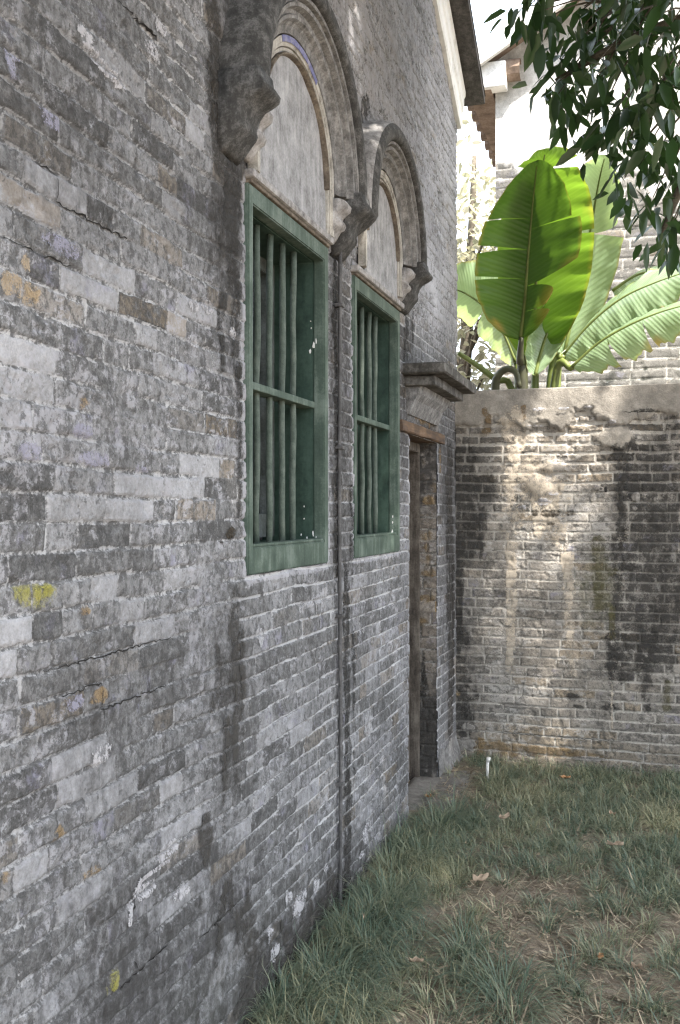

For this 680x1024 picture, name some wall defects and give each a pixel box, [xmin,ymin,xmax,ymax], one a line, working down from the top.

crack [119,1,157,41]
crack [35,161,127,240]
leakage [206,0,448,1024]
leakage [420,404,577,777]
leakage [599,408,680,729]
crack [43,634,171,715]
leakage [198,812,213,882]